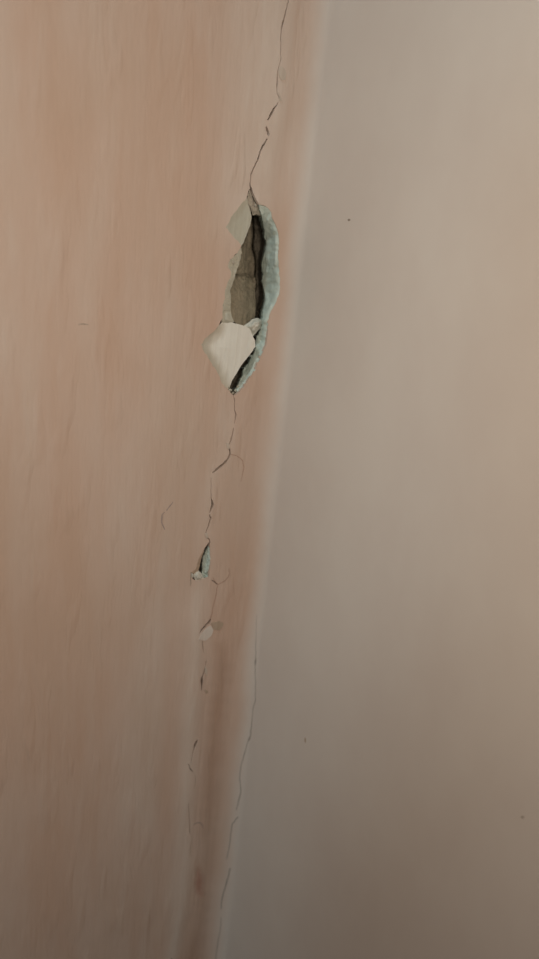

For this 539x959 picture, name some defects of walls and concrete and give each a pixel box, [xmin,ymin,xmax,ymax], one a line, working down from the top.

spalling [201,189,280,394]
spalling [190,544,210,585]
crack [199,571,230,641]
crack [216,618,257,954]